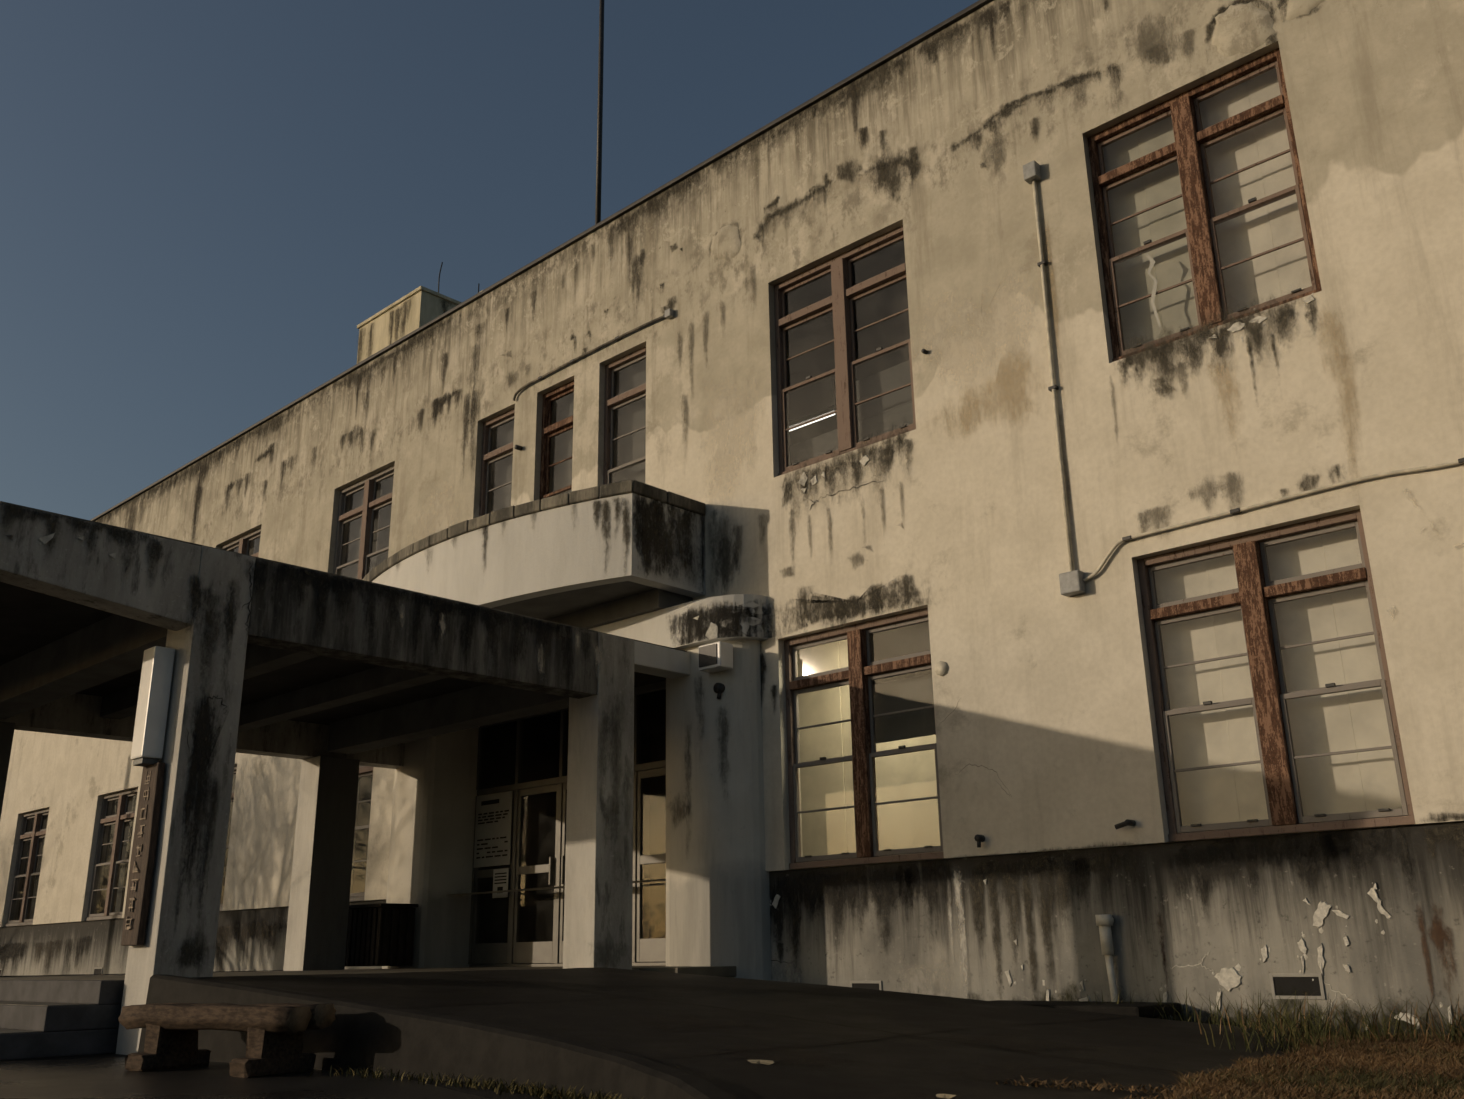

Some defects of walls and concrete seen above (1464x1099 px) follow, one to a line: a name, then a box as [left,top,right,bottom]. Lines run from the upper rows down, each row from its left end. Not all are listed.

water stain [1138,21,1193,61]
water stain [1120,297,1316,393]
water stain [593,498,741,587]
water stain [191,562,600,685]
water stain [670,567,922,709]
water stain [185,702,221,897]
water stain [0,937,92,973]
water stain [178,919,287,970]
water stain [770,850,1137,996]
peeling [1211,963,1242,1022]
water stain [1167,822,1464,913]
peeling [1368,882,1392,935]